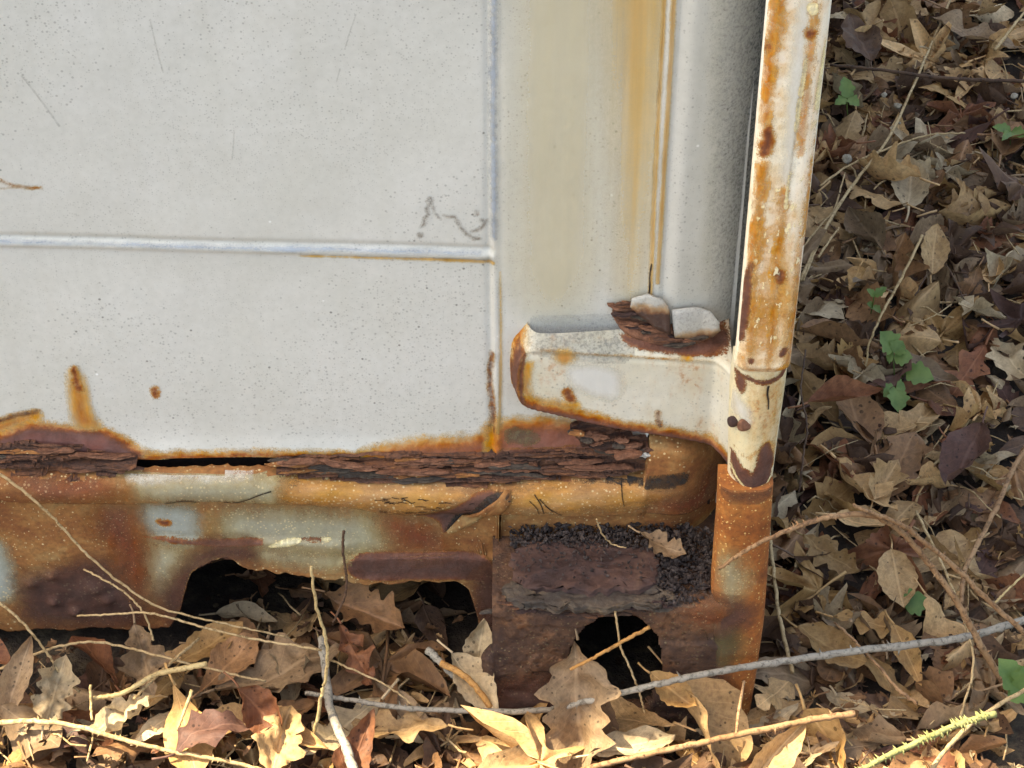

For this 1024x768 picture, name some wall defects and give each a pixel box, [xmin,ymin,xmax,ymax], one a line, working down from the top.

corrosion [602,0,821,394]
corrosion [0,287,728,514]
corrosion [722,487,770,501]
corrosion [17,505,332,628]
corrosion [346,550,493,632]
corrosion [713,596,752,681]